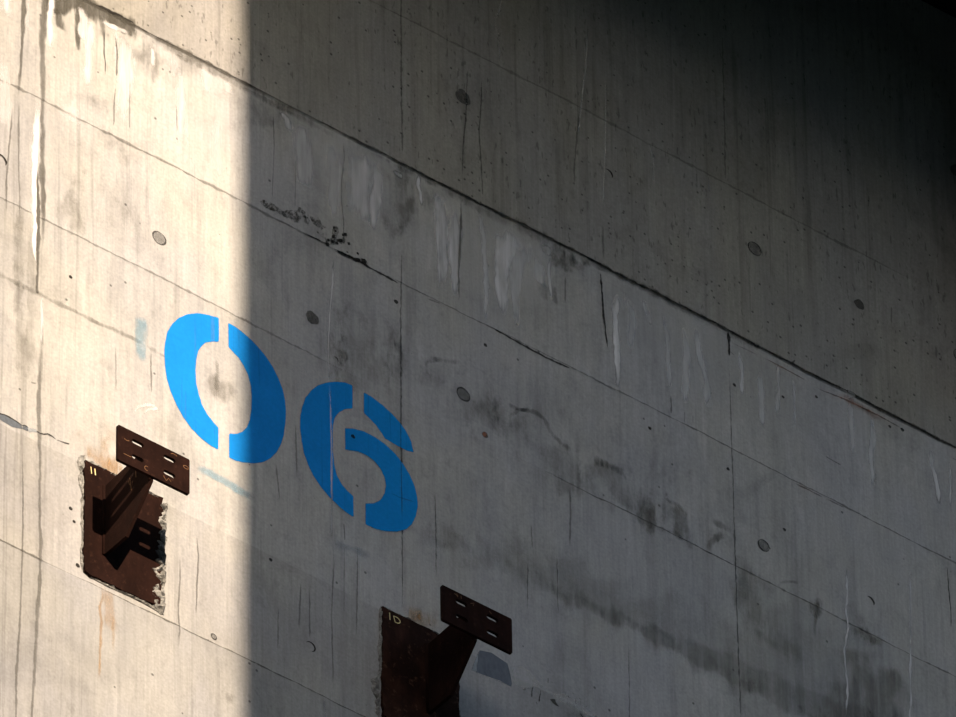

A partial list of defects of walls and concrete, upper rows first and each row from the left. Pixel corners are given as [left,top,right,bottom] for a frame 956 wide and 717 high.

leakage [40,0,135,96]
leakage [32,114,46,293]
spalling [326,226,368,265]
leakage [339,157,381,227]
leakage [435,198,462,291]
efflorescence [480,227,523,314]